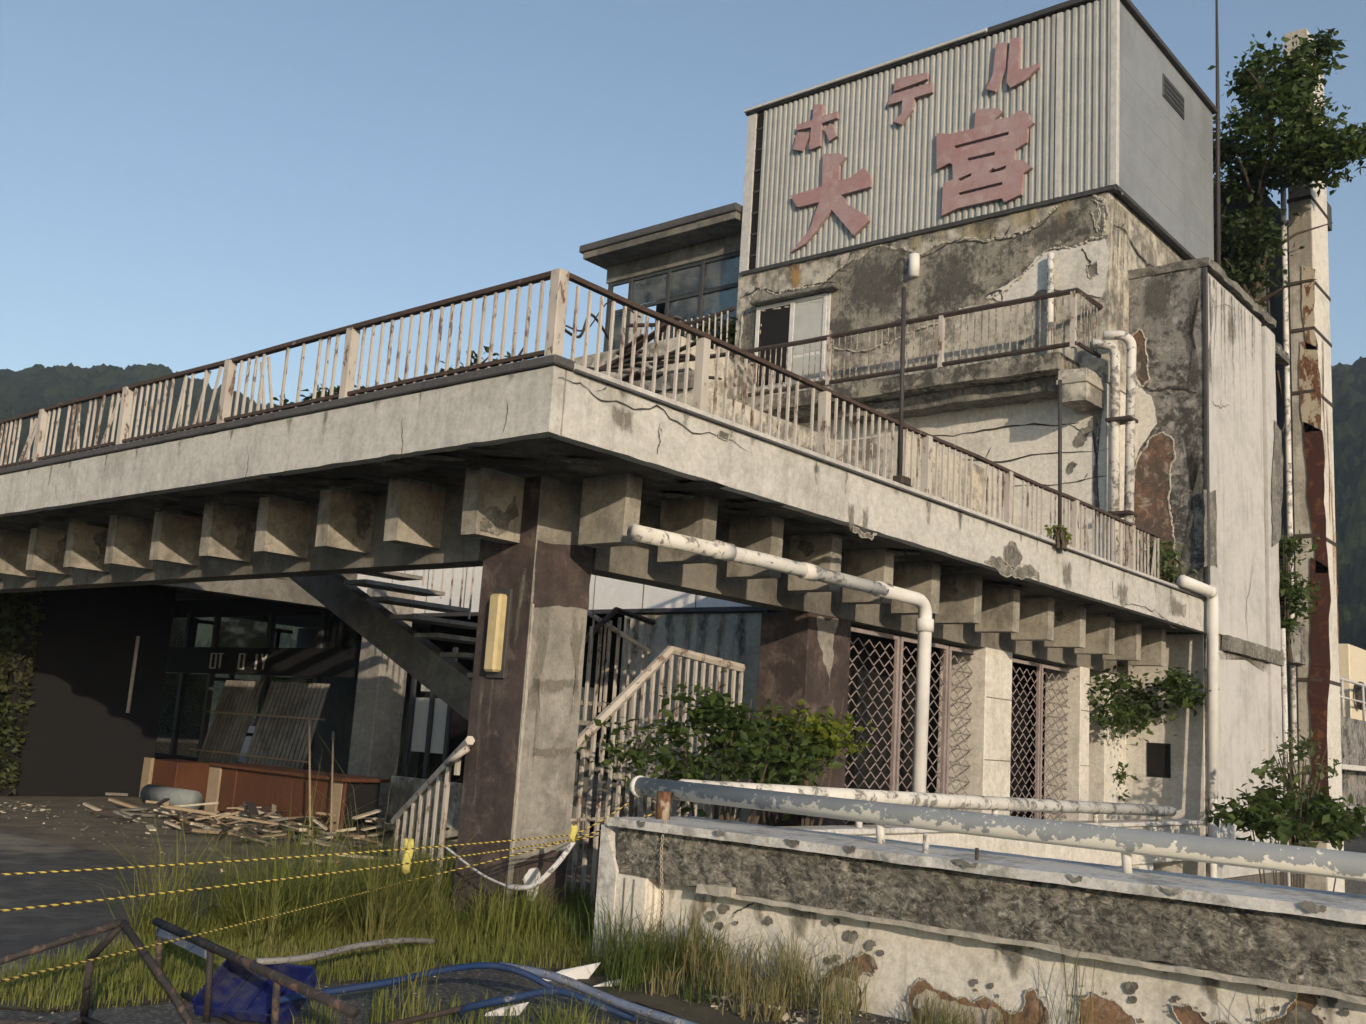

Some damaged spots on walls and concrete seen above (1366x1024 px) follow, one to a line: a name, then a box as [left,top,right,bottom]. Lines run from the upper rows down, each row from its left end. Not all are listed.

crack [922,201,1068,257]
flaking render [739,189,1123,366]
crack [986,289,1003,302]
flaking render [1132,322,1151,388]
crack [558,376,745,453]
flaking render [1134,428,1178,574]
rust [1299,265,1339,798]
peeling [982,541,1040,583]
flaking render [903,977,1050,1024]
flaking render [1068,981,1144,1024]
flaking render [1162,995,1230,1024]
flaking render [1248,992,1349,1024]